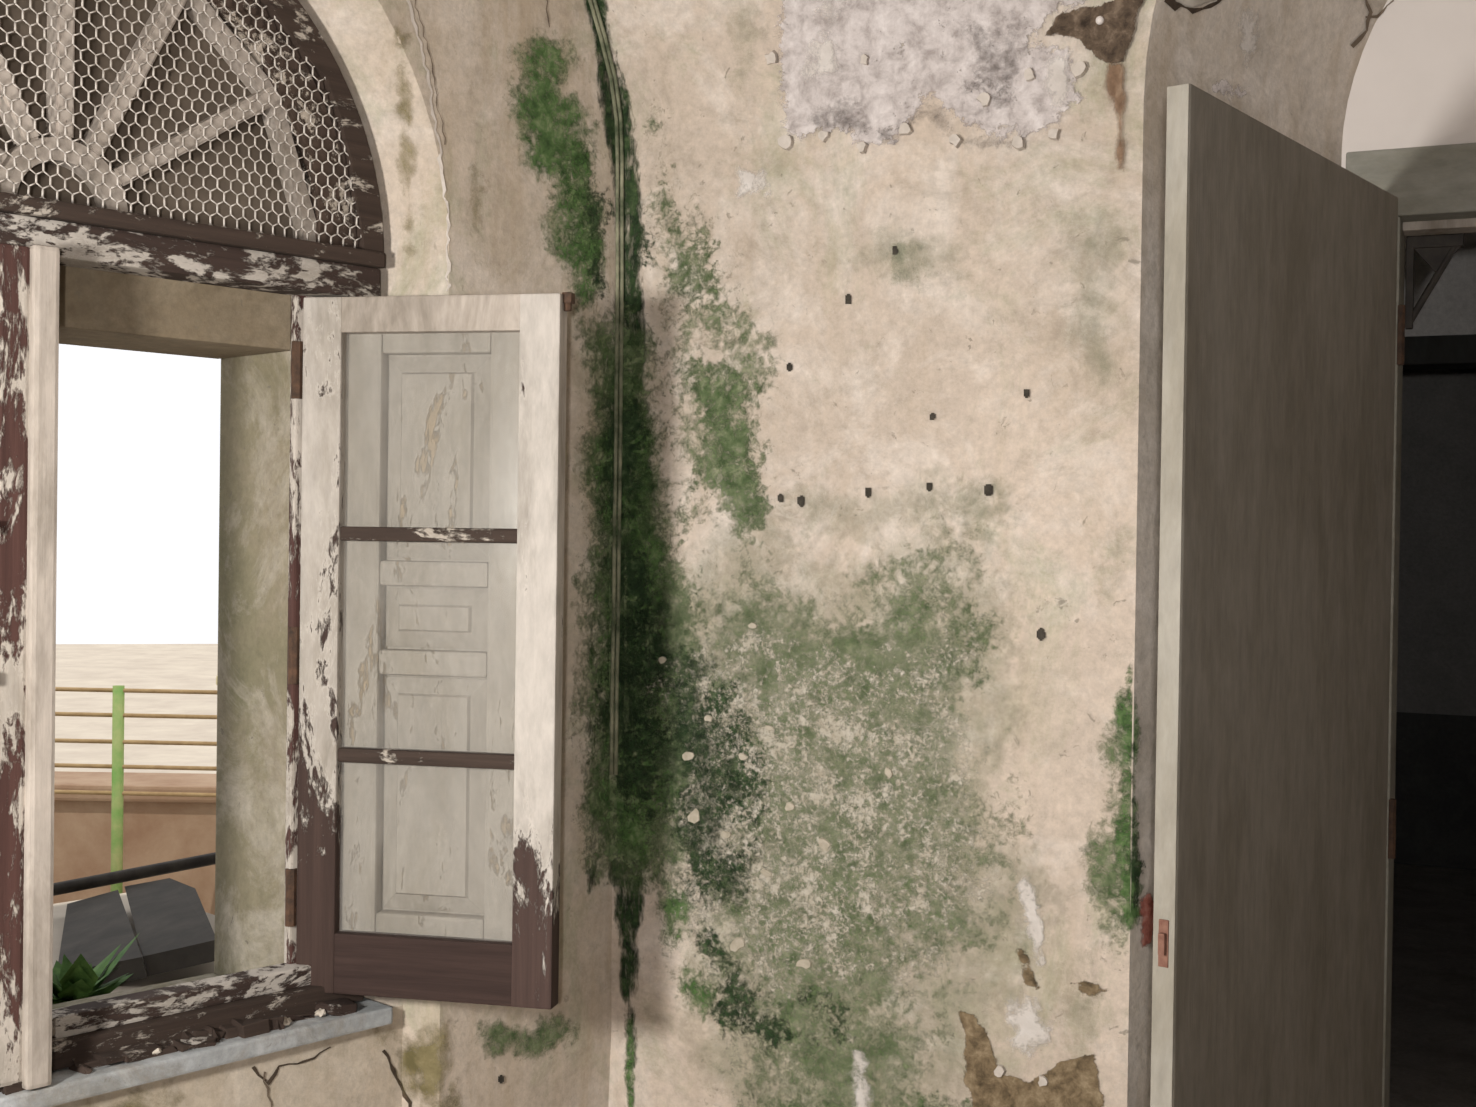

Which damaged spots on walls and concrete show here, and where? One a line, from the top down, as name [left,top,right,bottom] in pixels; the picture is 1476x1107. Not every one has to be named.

spalling [764,0,1144,154]
corrosion [1106,64,1125,169]
damp [509,0,1025,1107]
damp [1086,667,1146,938]
spalling [1006,879,1051,1056]
spalling [1071,981,1106,996]
crack [252,1047,331,1107]
crack [382,1049,412,1107]
spalling [959,1010,1104,1107]